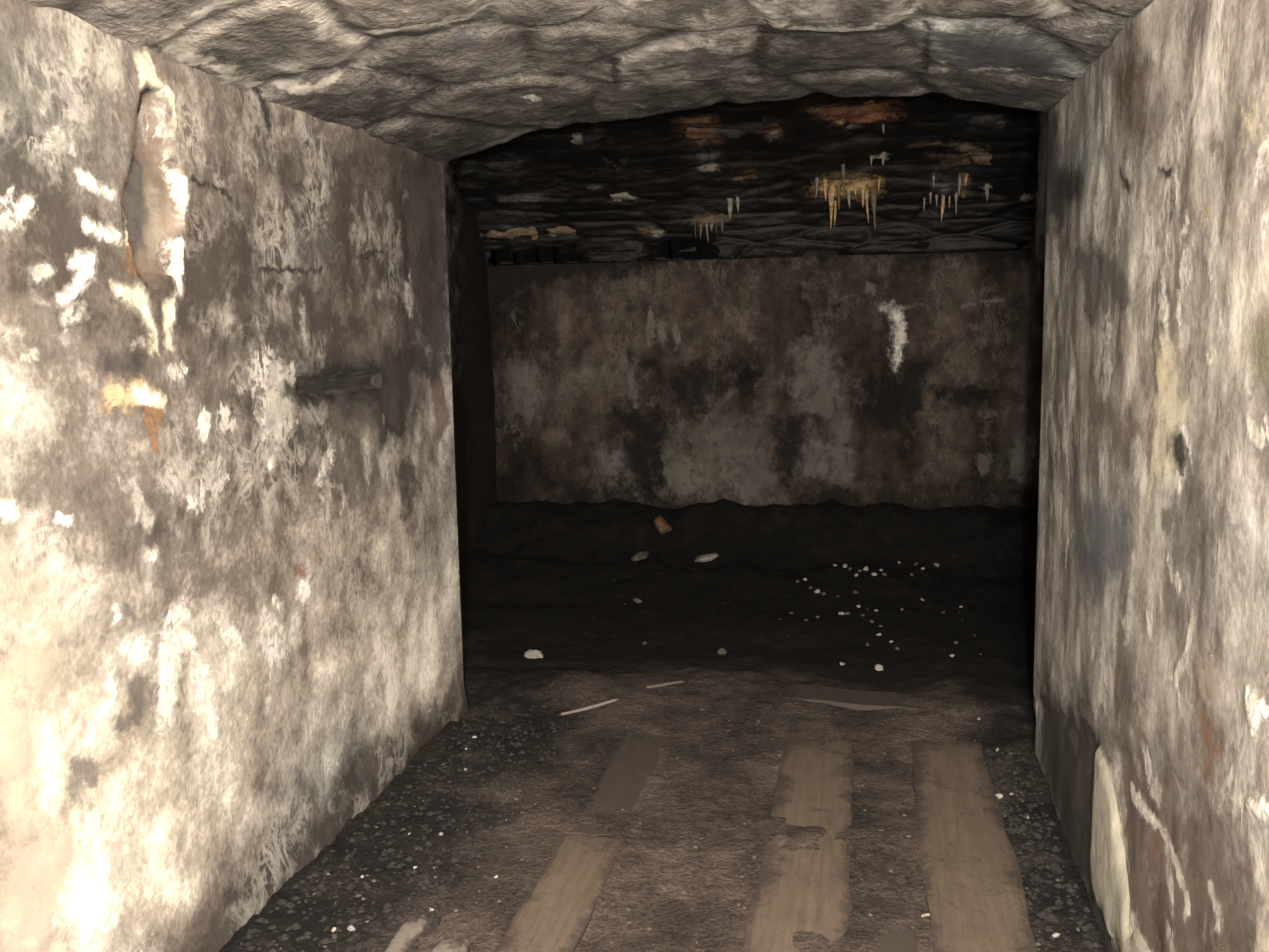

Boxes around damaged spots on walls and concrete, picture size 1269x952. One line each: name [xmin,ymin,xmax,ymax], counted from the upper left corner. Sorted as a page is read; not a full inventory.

rust [809,98,903,130]
leakage [0,188,34,230]
peeling [33,264,53,281]
flaking render [56,51,189,354]
crack [260,264,323,274]
crack [360,250,384,259]
leakage [691,196,740,243]
leakage [811,152,890,230]
leakage [907,141,992,221]
leakage [865,282,997,431]
rust [99,351,167,452]
flaking render [1040,674,1262,952]